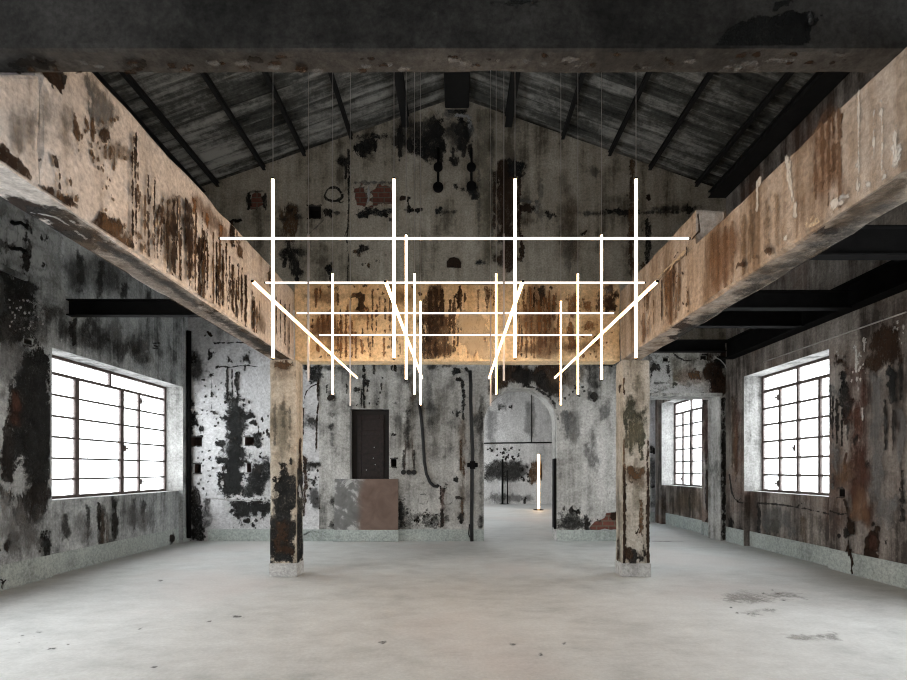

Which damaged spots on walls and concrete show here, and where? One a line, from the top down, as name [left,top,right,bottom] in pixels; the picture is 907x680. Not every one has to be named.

rust [192,197,243,259]
flaking render [306,181,411,219]
damp [516,176,525,262]
damp [785,156,797,218]
rust [814,108,843,207]
damp [812,91,907,237]
rust [306,284,422,358]
rust [516,285,614,359]
rust [660,266,676,323]
damp [225,366,246,402]
damp [624,419,655,487]
flaking render [584,440,627,563]